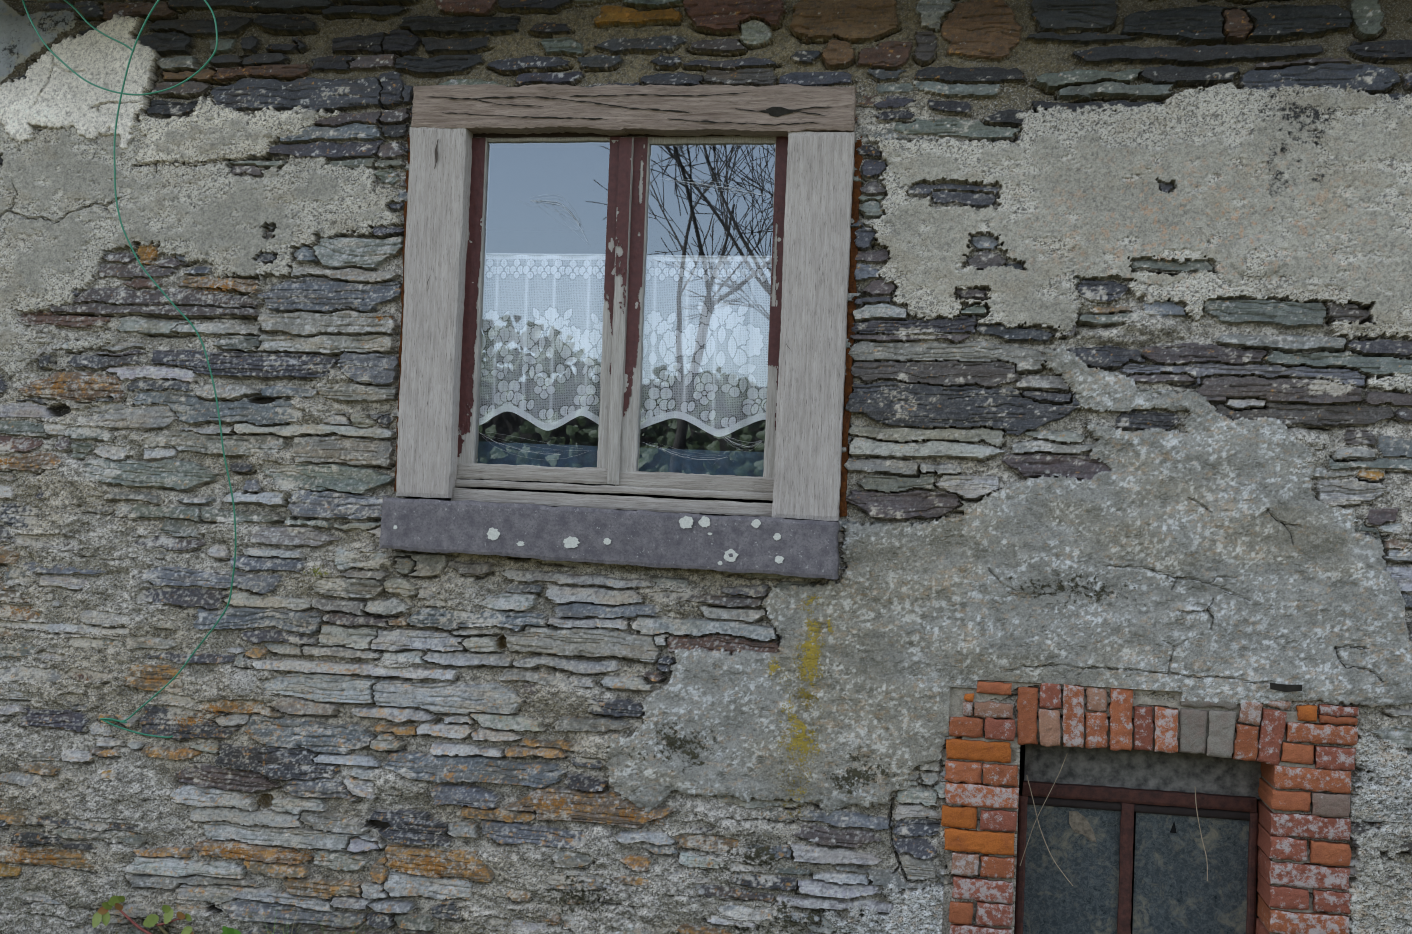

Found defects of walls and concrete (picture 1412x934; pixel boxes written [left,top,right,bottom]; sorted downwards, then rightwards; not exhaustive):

peeling [0,14,404,561]
peeling [457,138,486,457]
spalling [134,225,828,814]
peeling [604,82,1412,934]
crack [1008,565,1264,684]
peeling [207,905,223,915]
peeling [365,820,390,832]